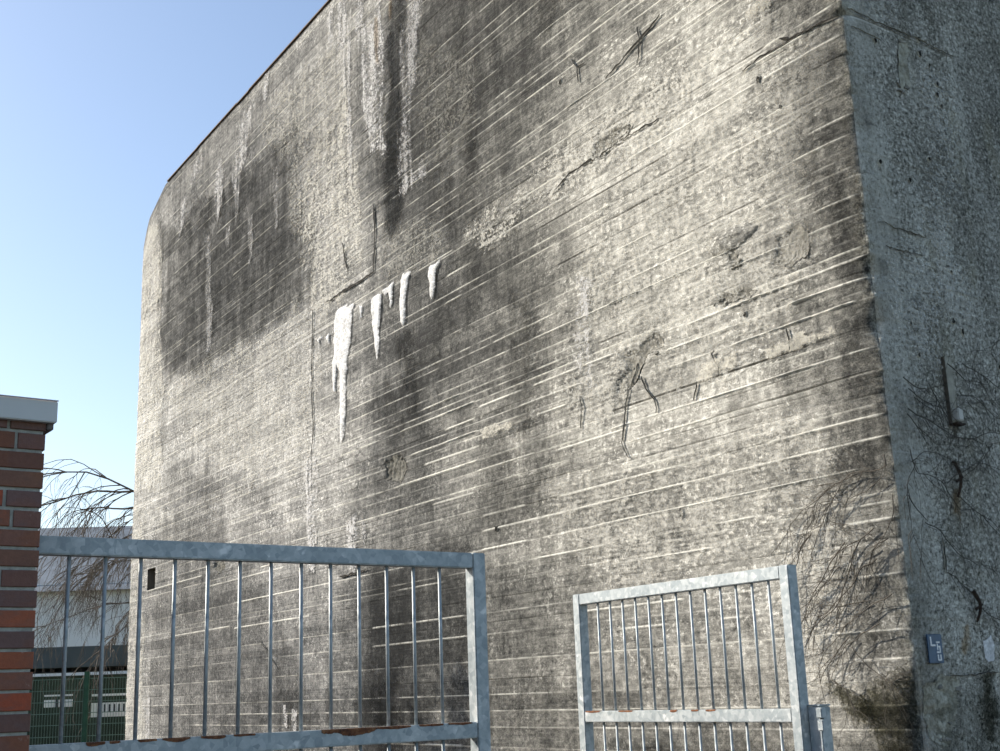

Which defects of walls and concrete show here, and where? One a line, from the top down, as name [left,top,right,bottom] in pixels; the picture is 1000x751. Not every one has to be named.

leakage [327,0,386,184]
leakage [214,105,252,221]
crack [621,363,657,458]